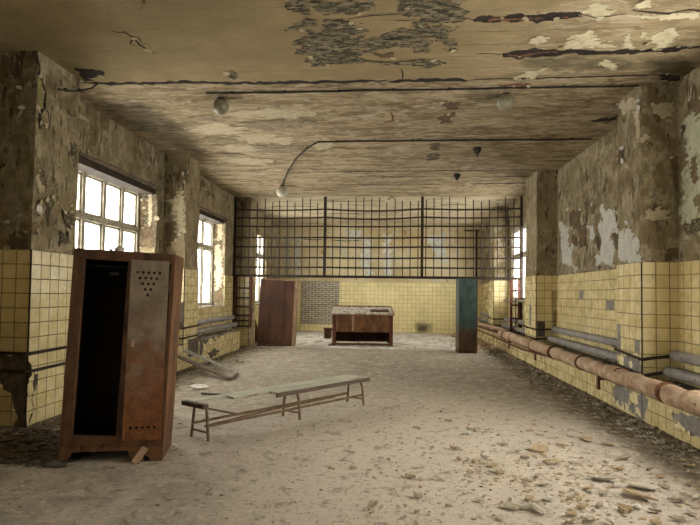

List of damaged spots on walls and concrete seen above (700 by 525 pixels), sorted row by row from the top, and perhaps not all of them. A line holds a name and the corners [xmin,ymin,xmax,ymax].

crack [113,31,156,54]
spalling [284,0,470,79]
peeling [598,59,617,71]
peeling [558,0,700,51]
peeling [616,96,649,143]
peeling [138,170,189,249]
peeling [213,224,224,305]
peeling [557,200,642,275]
peeling [645,96,700,262]
spalling [617,324,641,374]
spalling [0,354,39,428]
spalling [612,385,648,420]